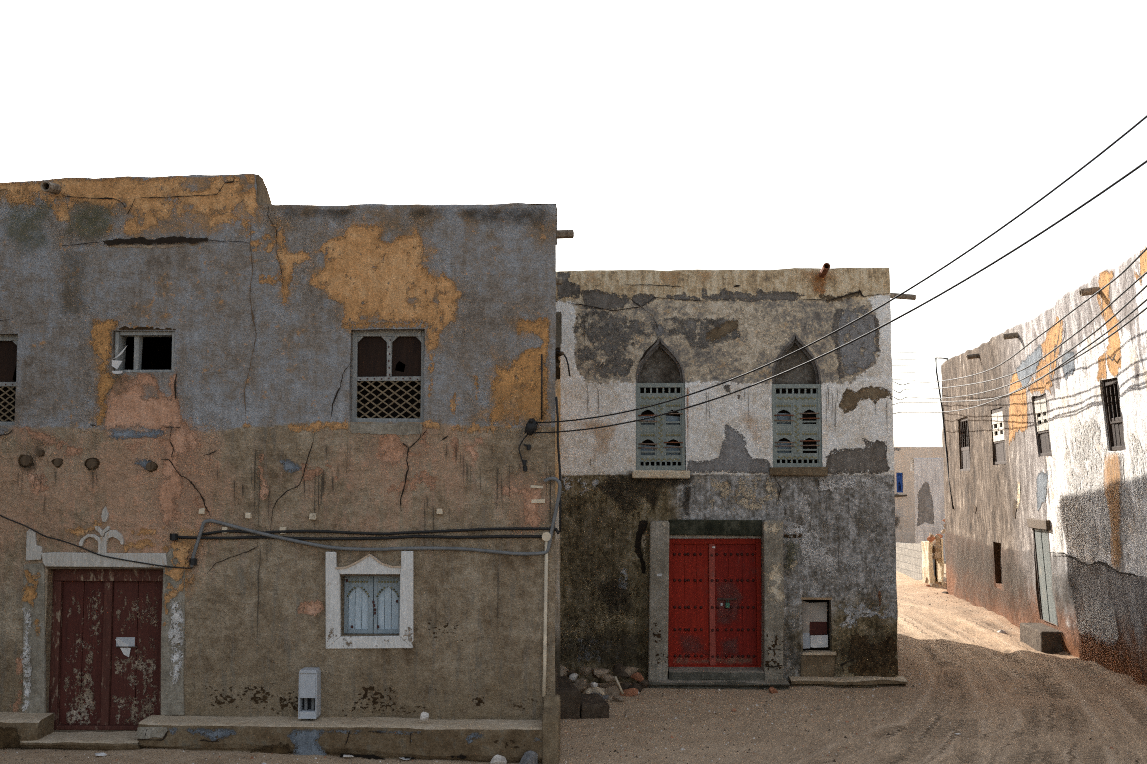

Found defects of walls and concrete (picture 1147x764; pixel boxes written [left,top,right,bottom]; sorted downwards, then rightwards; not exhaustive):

crack [60,180,284,422]
peeling [0,174,462,397]
peeling [420,317,560,461]
spalling [556,272,892,414]
peeling [1008,316,1063,446]
peeling [64,318,209,725]
crack [163,427,210,515]
crack [400,431,448,511]
leakage [599,474,693,515]
spalling [687,424,901,677]
peeling [1056,416,1147,562]
leakage [1067,605,1117,643]